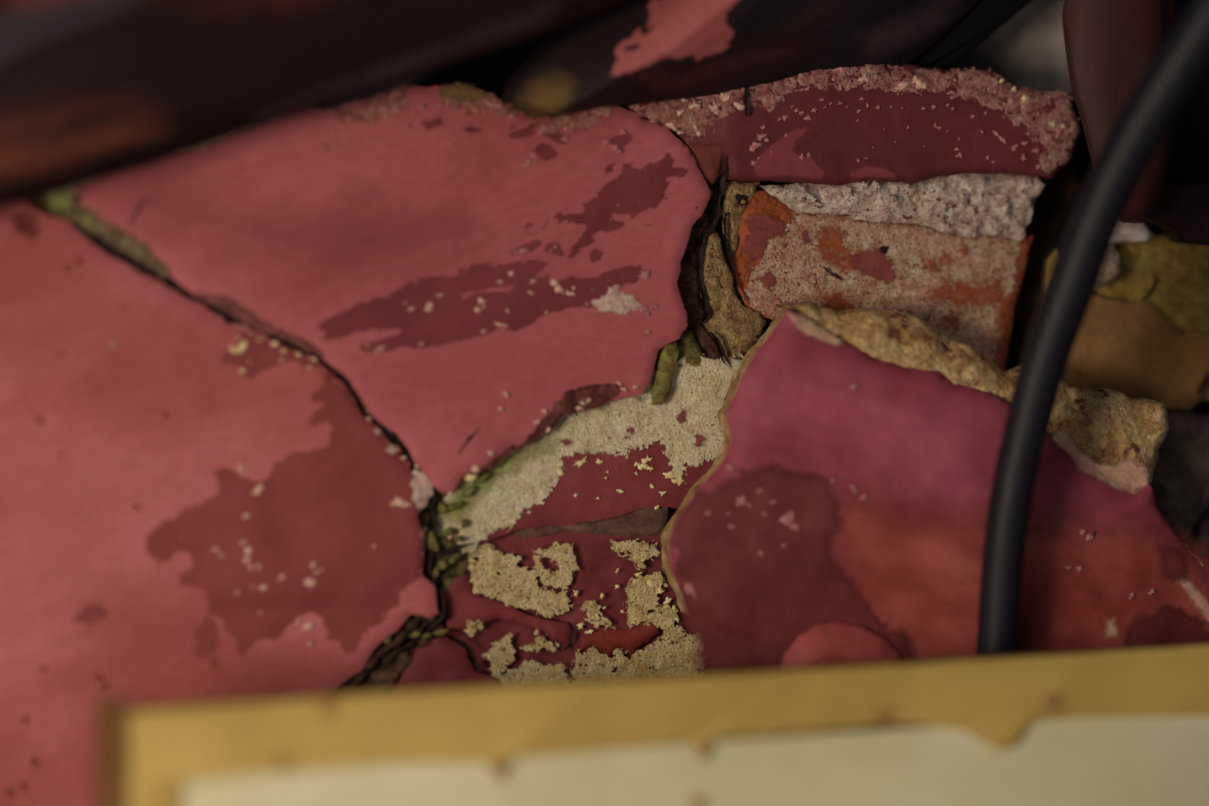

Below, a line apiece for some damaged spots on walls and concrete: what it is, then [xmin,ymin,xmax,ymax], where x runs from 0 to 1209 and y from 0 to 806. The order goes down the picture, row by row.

peeling [318,40,1079,404]
crack [696,156,745,369]
crack [27,195,491,693]
peeling [145,332,433,671]
spalling [454,381,639,490]
crack [564,621,575,651]
peeling [512,464,915,671]
spalling [1048,380,1169,493]